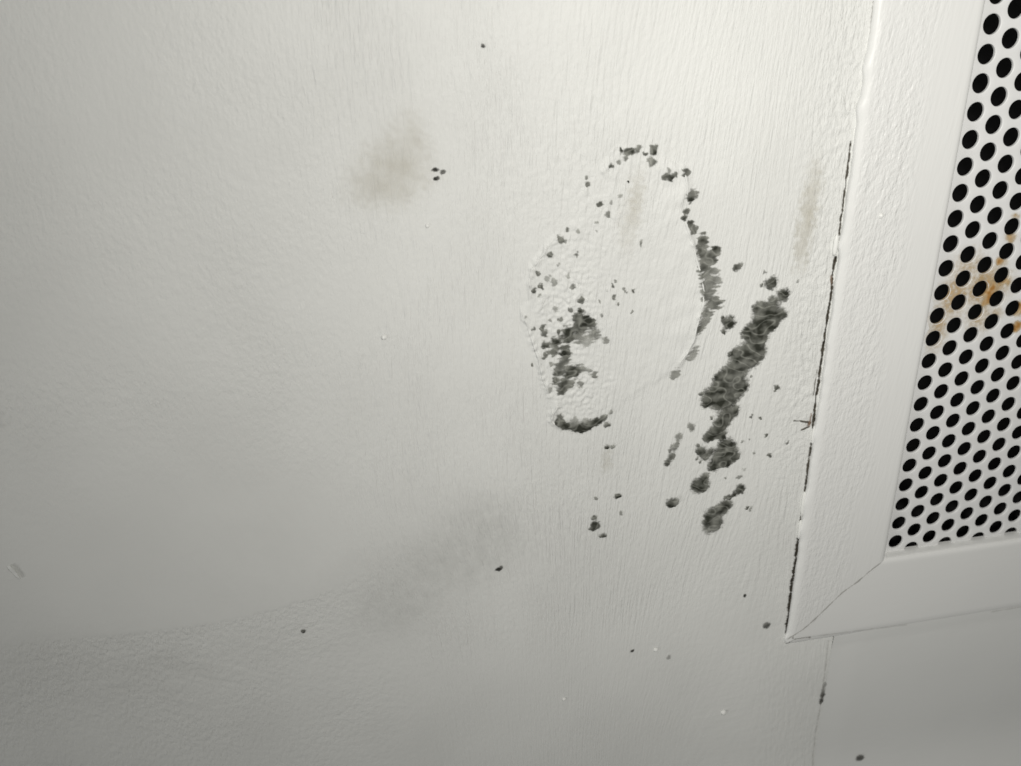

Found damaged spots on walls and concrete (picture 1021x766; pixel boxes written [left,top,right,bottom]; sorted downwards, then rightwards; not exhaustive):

damp [609,145,658,168]
damp [662,168,691,182]
rust [934,257,1010,334]
rust [1013,301,1021,332]
damp [664,190,790,533]
damp [588,515,607,538]